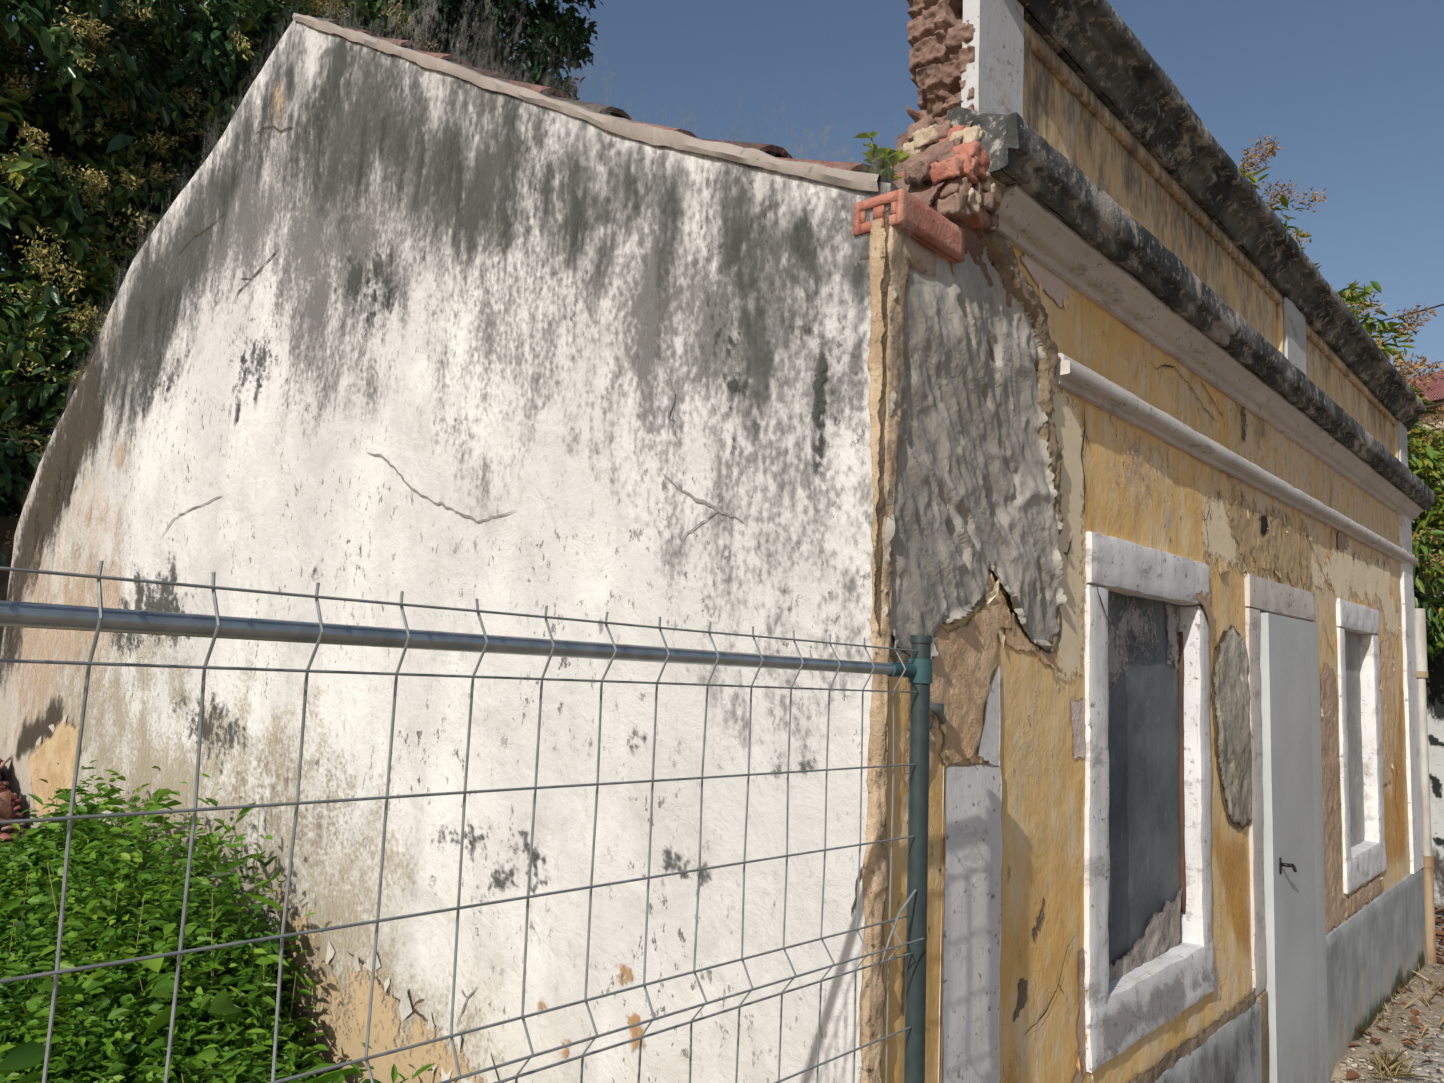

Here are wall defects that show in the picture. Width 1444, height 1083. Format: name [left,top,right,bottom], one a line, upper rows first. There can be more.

leakage [7,0,893,613]
spalling [27,715,80,830]
leakage [0,626,442,1048]
crack [367,452,514,523]
leakage [431,819,547,914]
spalling [859,206,911,1083]
peeling [890,103,1087,1083]
spalling [1105,888,1218,1054]
peeling [1201,475,1401,785]
spalling [1320,663,1384,935]
leakage [1426,638,1444,746]
leakage [1429,774,1442,797]